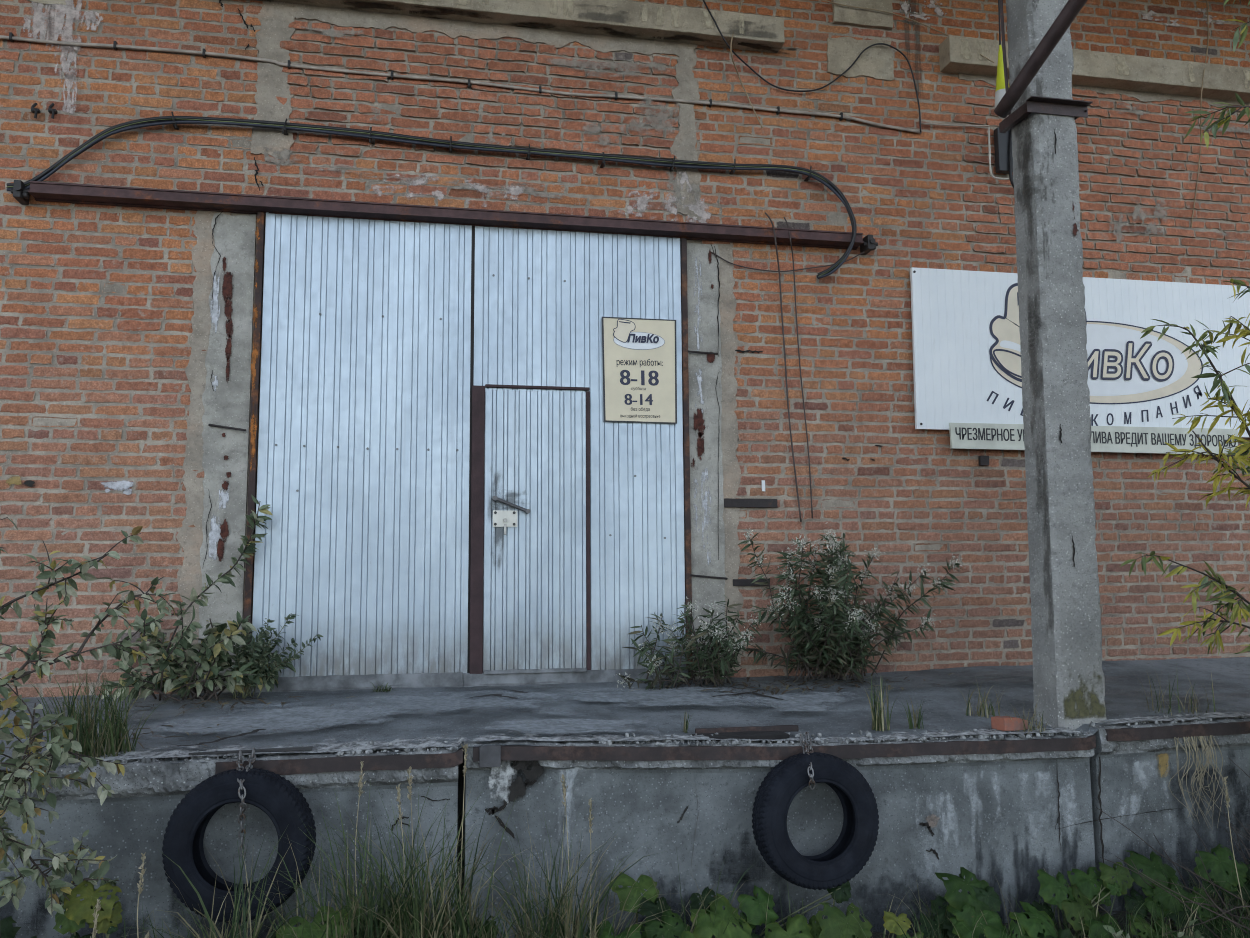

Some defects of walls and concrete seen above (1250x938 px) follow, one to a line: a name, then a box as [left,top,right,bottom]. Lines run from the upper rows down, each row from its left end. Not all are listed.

crack [212,211,223,309]
spalling [210,257,233,391]
corrosion [250,306,258,471]
peeling [209,455,231,562]
spalling [488,760,544,803]
spalling [94,725,1081,761]
spalling [1103,712,1250,724]
leakage [968,835,1100,924]
leakage [1117,755,1250,911]